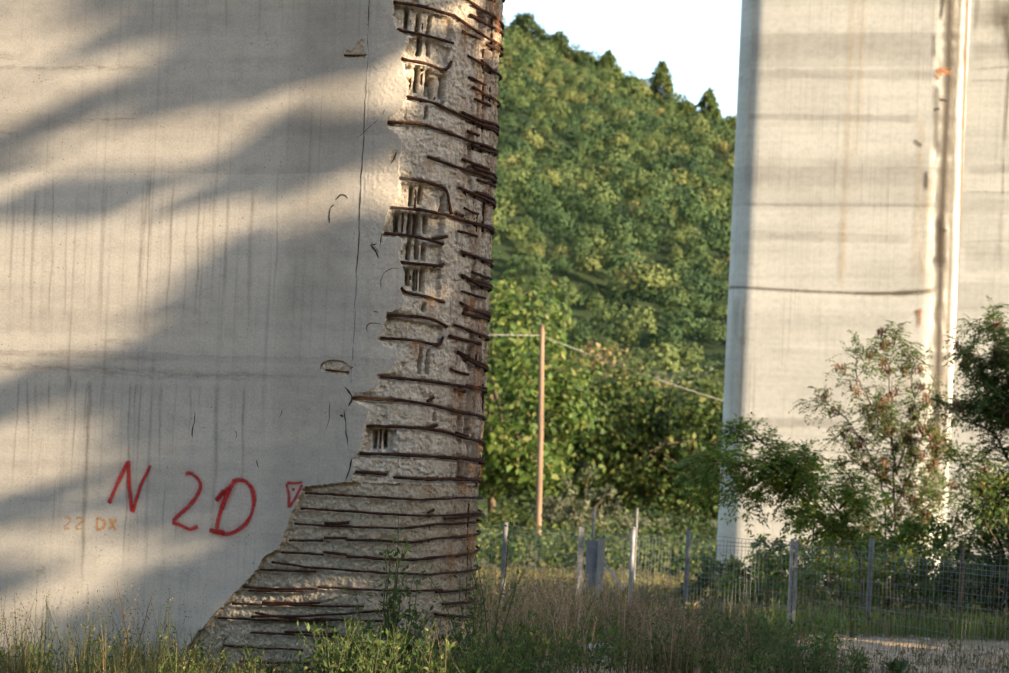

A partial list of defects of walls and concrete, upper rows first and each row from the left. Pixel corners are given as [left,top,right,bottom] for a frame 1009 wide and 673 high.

spalling [173,0,505,673]